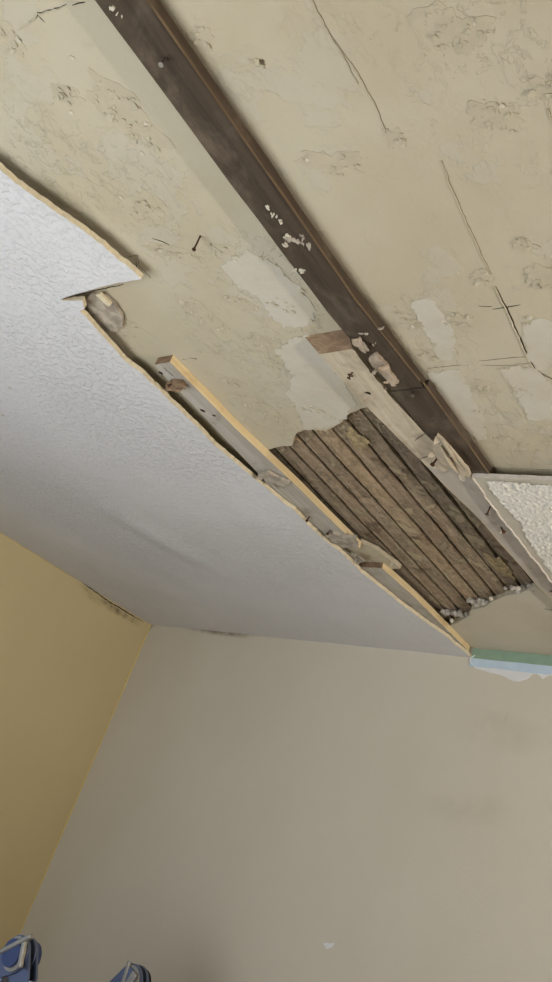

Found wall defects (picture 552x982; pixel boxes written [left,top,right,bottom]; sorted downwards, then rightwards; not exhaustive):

crack [312,0,393,149]
peeling [221,249,356,430]
peeling [411,298,488,441]
peeling [498,316,552,421]
spalling [440,597,489,618]